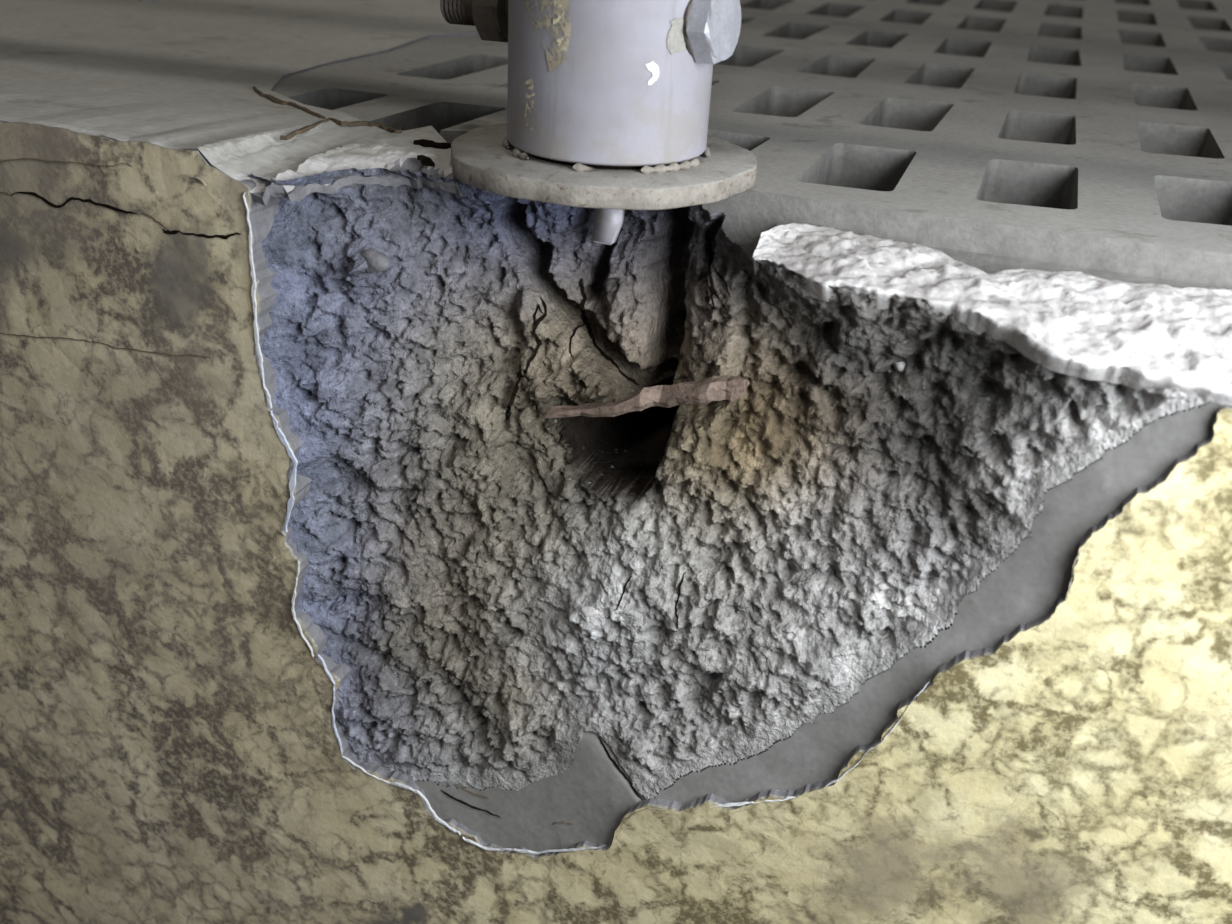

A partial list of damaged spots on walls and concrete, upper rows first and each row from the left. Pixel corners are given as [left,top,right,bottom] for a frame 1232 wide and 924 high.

crack [0,158,132,167]
crack [0,192,241,239]
crack [505,280,640,420]
rust [544,376,750,418]
spalling [243,168,1232,854]